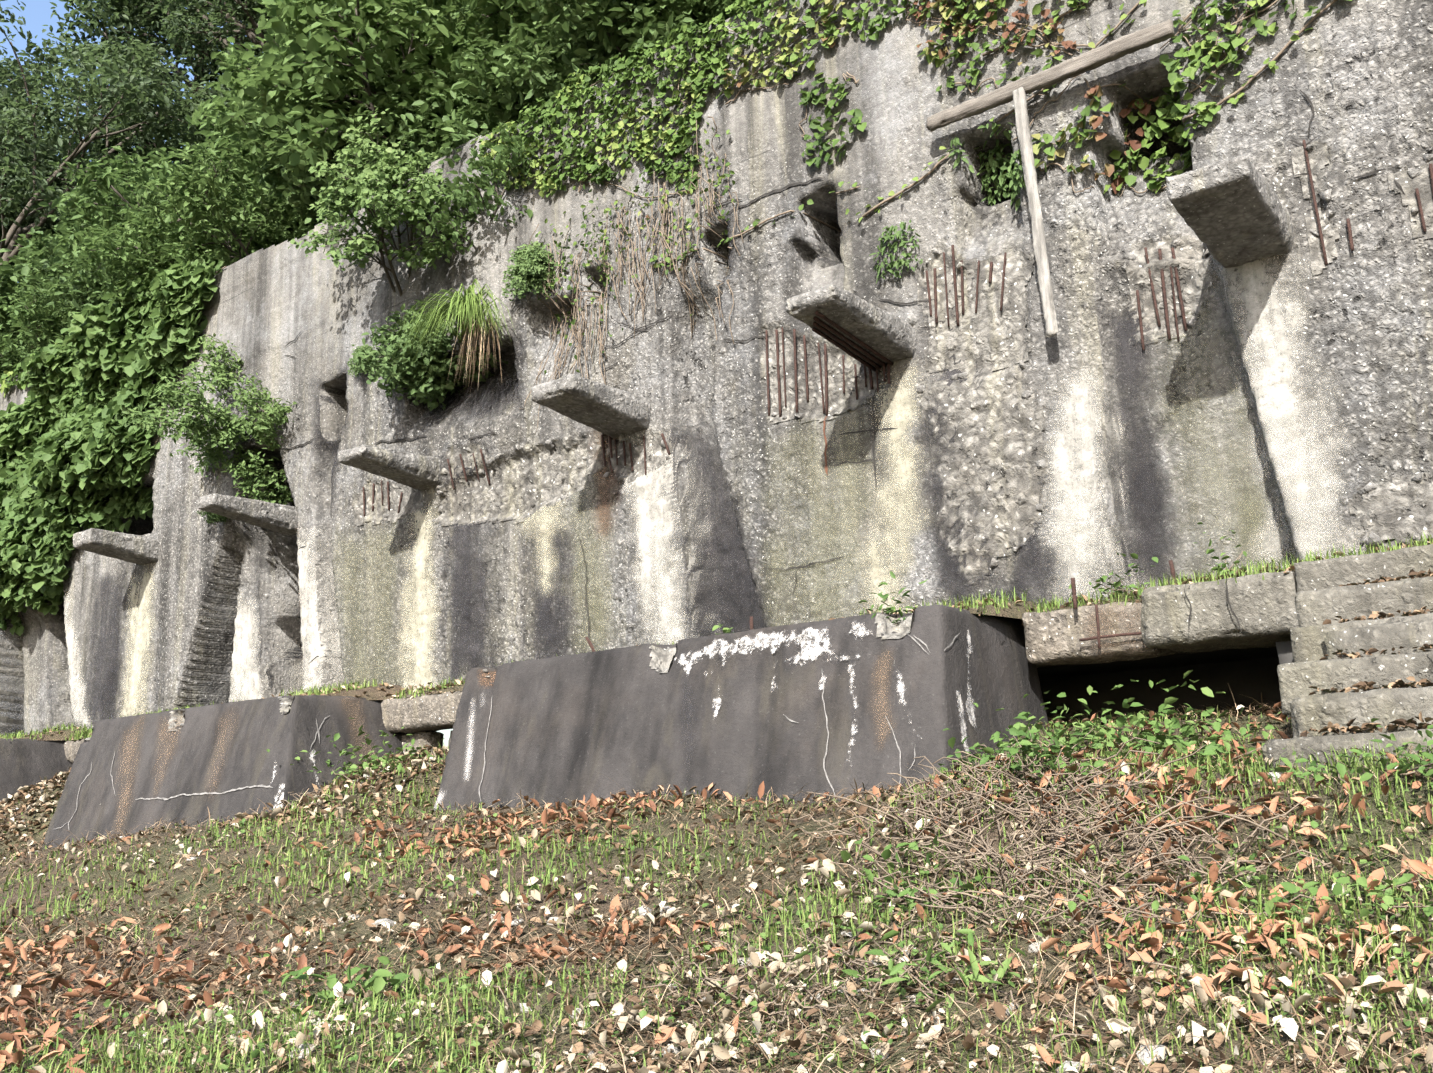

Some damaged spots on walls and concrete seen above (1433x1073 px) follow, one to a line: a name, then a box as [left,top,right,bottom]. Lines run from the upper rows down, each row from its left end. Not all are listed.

damp [1010,310,1170,602]
damp [626,432,860,682]
spalling [649,643,677,673]
spalling [875,610,915,640]
crack [56,753,273,829]